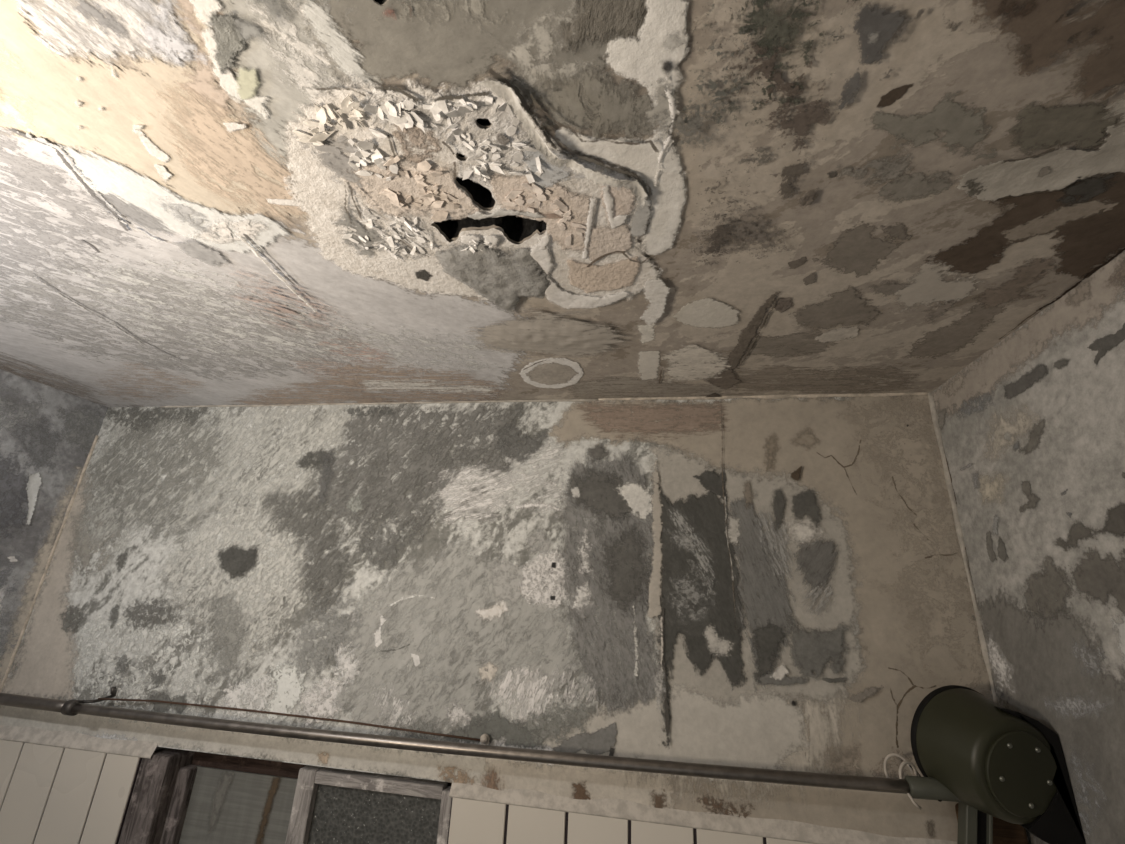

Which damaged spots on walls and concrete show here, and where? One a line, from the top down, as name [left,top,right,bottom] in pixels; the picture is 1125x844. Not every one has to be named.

peeling [0,0,663,407]
damp [294,0,659,140]
damp [568,0,1125,399]
damp [0,354,547,727]
flaking render [0,252,1125,842]
damp [373,444,848,756]
crack [818,440,861,495]
damp [977,549,1125,844]